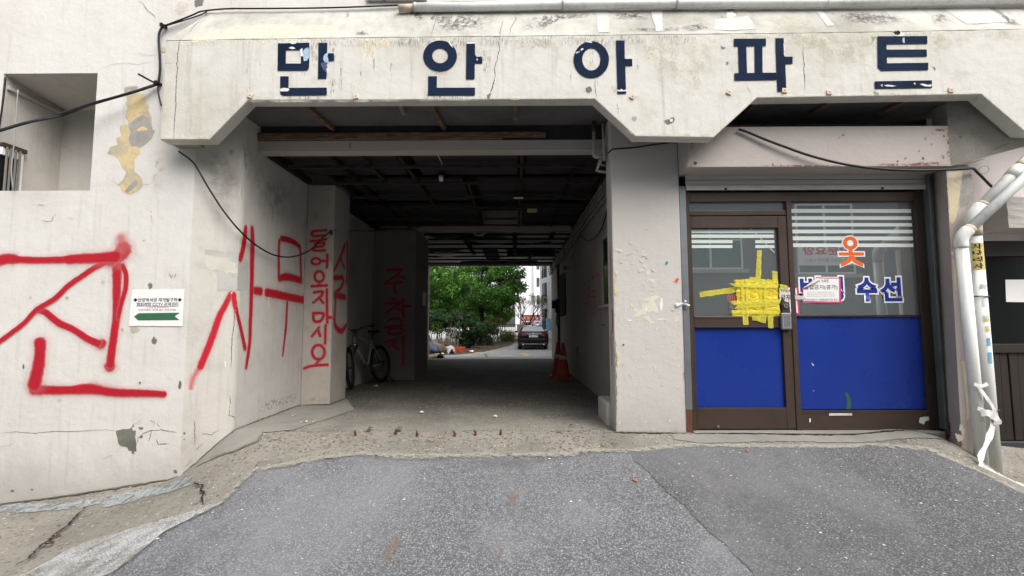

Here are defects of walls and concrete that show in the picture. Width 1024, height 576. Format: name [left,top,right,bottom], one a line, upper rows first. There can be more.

crack [490,17,516,93]
peeling [107,86,155,195]
peeling [614,241,680,342]
spalling [116,425,143,454]